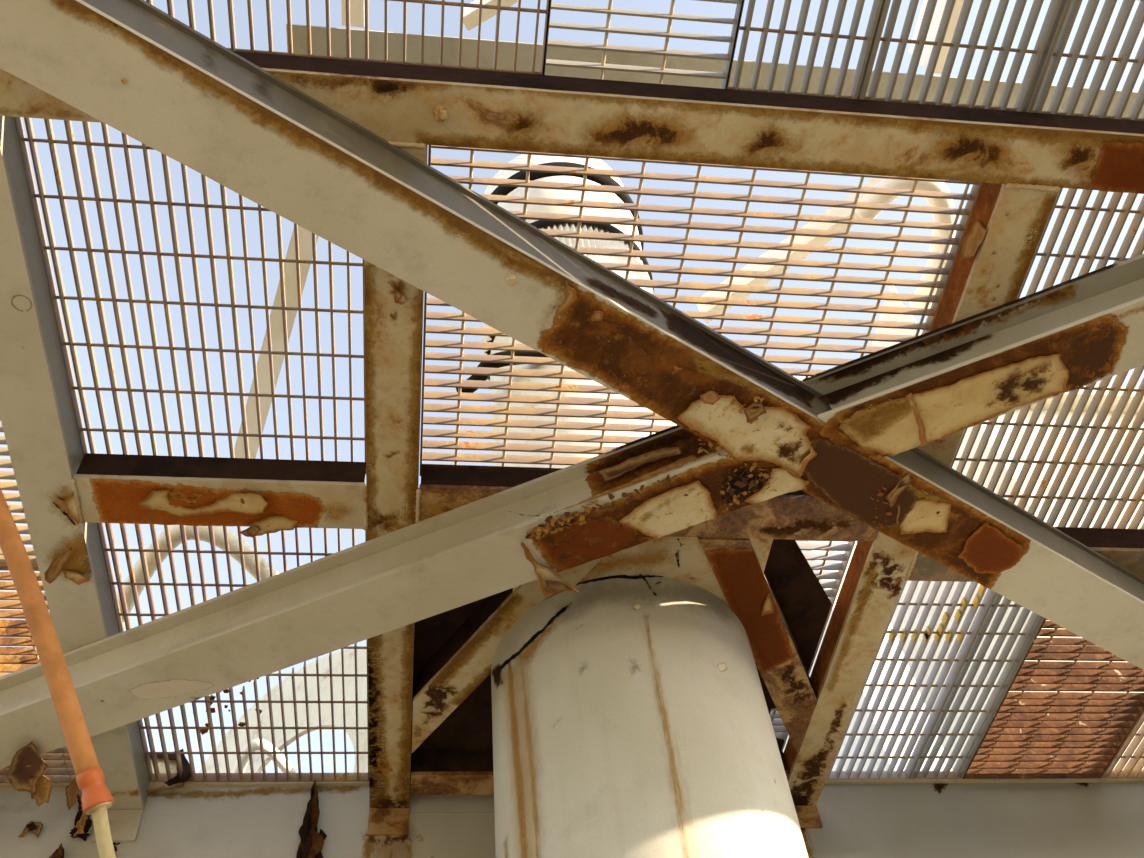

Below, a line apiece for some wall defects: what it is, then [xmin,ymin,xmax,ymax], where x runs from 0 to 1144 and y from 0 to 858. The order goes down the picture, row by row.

corrosion [51,0,1144,590]
spalling [44,489,91,585]
crack [496,538,684,676]
peeling [521,349,818,596]
corrosion [706,548,814,710]
corrosion [828,553,903,691]
corrosion [129,593,558,858]
corrosion [655,673,684,831]
corrosion [790,704,847,806]